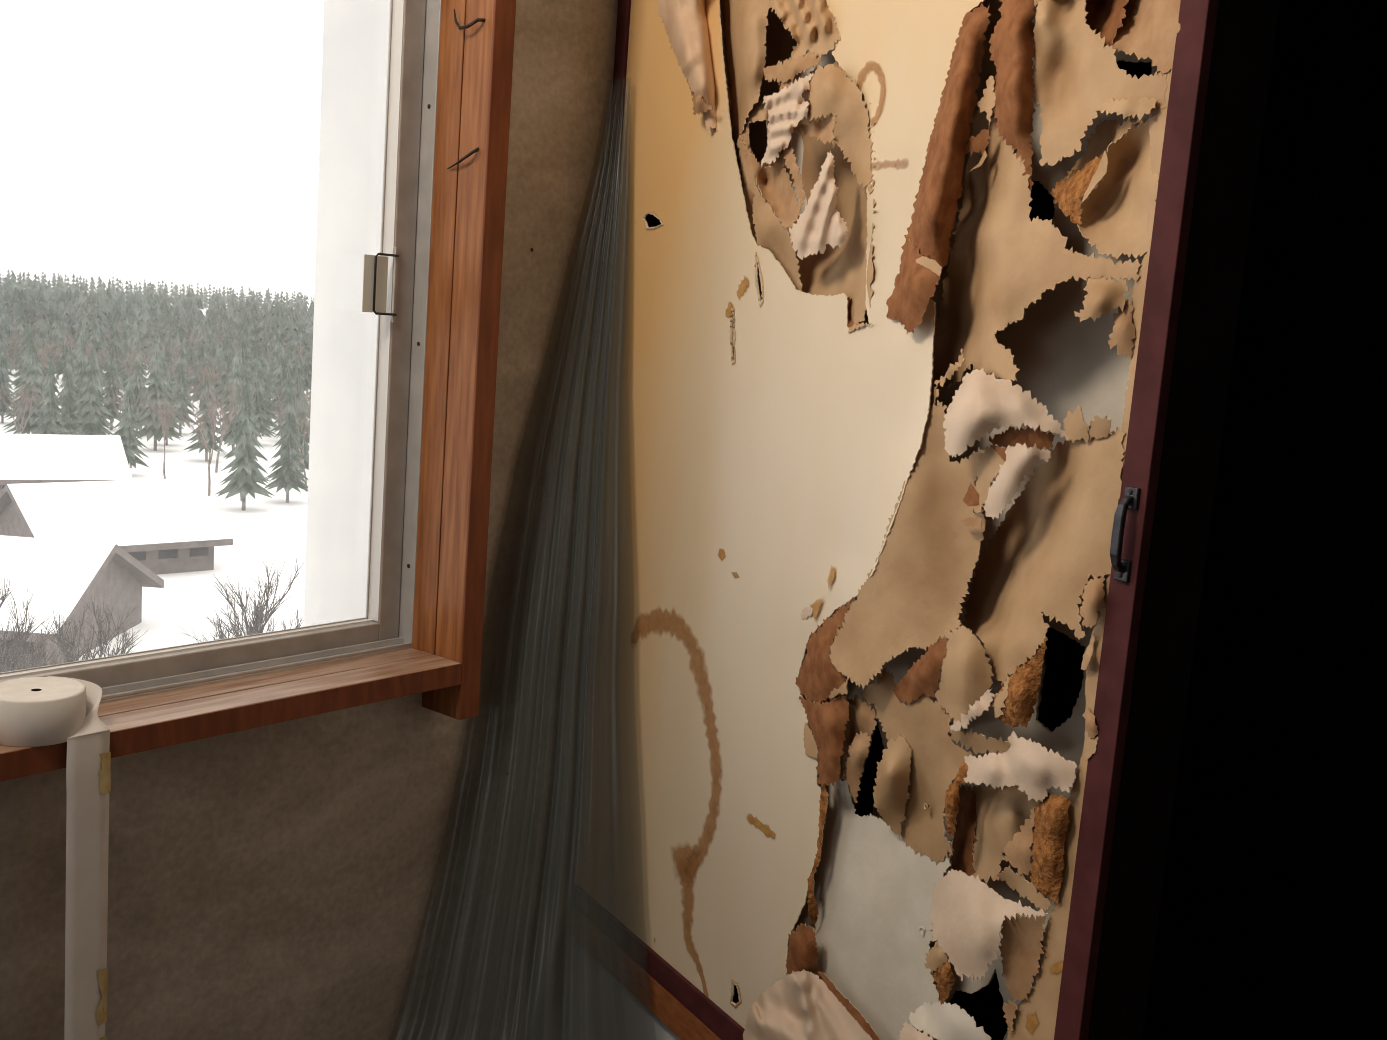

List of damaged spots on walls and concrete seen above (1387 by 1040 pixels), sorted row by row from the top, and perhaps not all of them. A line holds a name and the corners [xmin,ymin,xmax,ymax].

leakage [631,609,721,998]